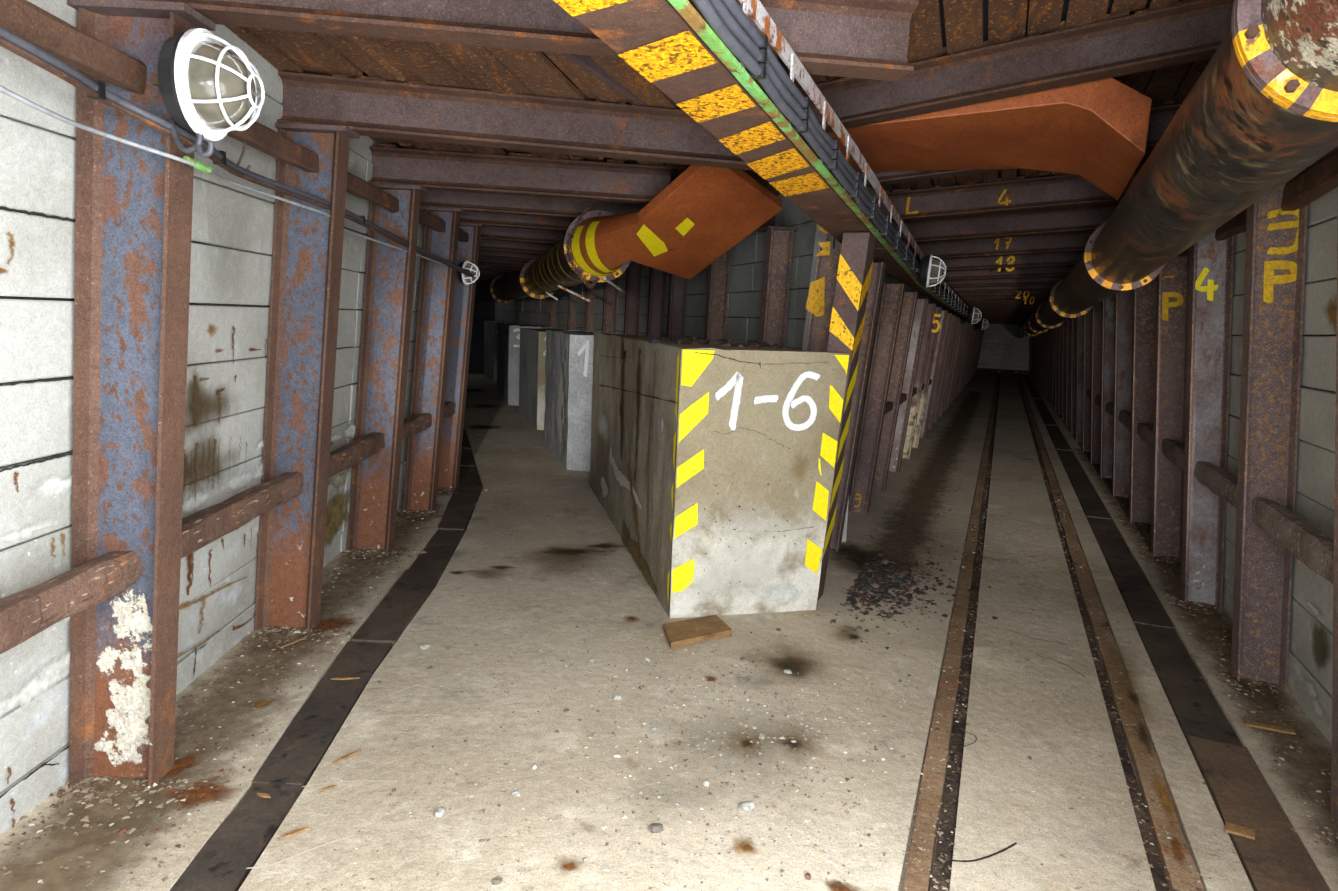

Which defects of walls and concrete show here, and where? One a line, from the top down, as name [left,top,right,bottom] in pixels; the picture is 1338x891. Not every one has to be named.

rust [0,232,15,273]
damp [185,376,228,427]
damp [182,437,263,512]
rust [177,538,255,658]
peeling [94,589,153,767]